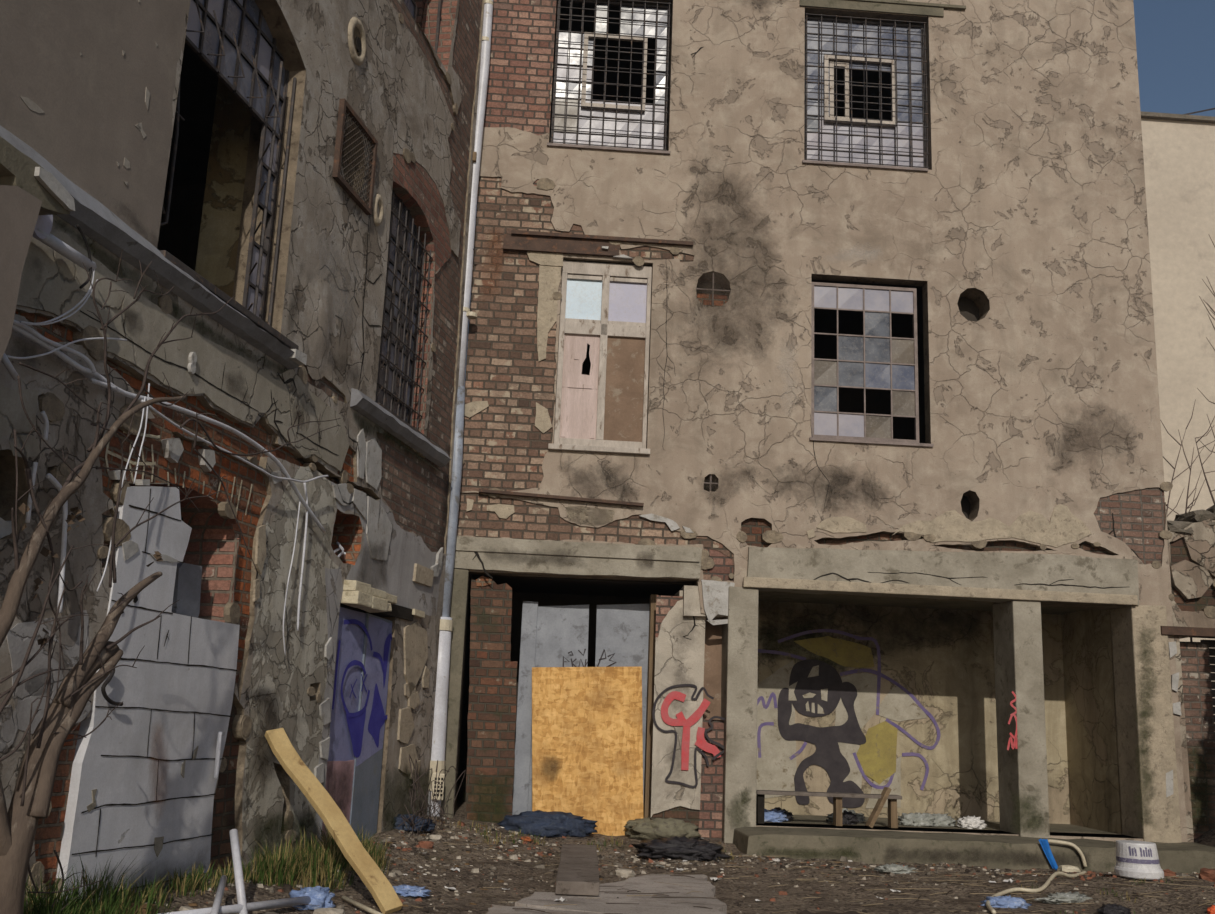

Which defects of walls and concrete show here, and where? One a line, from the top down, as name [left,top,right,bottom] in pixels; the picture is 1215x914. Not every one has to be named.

crack [80,310,380,534]
crack [319,215,382,386]
flaking render [15,0,783,686]
crack [662,265,676,447]
crack [807,415,829,507]
peeling [807,482,1196,568]
flaking render [1169,576,1215,618]
peeling [0,610,89,752]
flaking render [26,698,91,904]
flaking render [210,703,252,870]
peeling [397,622,430,784]
flaking render [650,806,700,826]